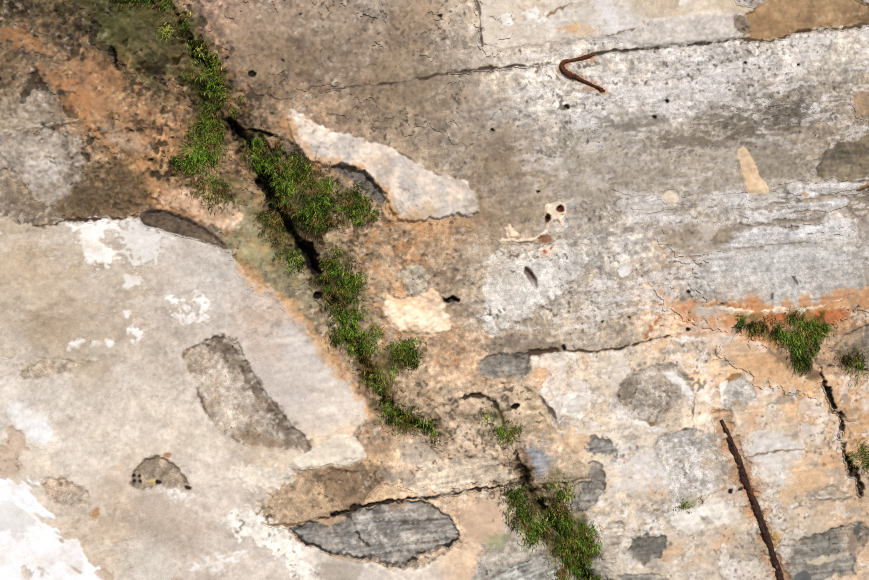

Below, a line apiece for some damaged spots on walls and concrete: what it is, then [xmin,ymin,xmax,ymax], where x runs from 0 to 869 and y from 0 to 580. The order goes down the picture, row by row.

crack [320,28,559,93]
corrosion [555,48,611,98]
peeling [726,0,869,44]
leakage [0,94,88,207]
leakage [154,185,244,236]
peeling [224,108,470,236]
crack [448,391,498,405]
crack [746,363,869,497]
peeling [0,397,115,580]
crack [260,448,546,529]
corrosion [709,402,832,580]
spalling [288,499,462,568]